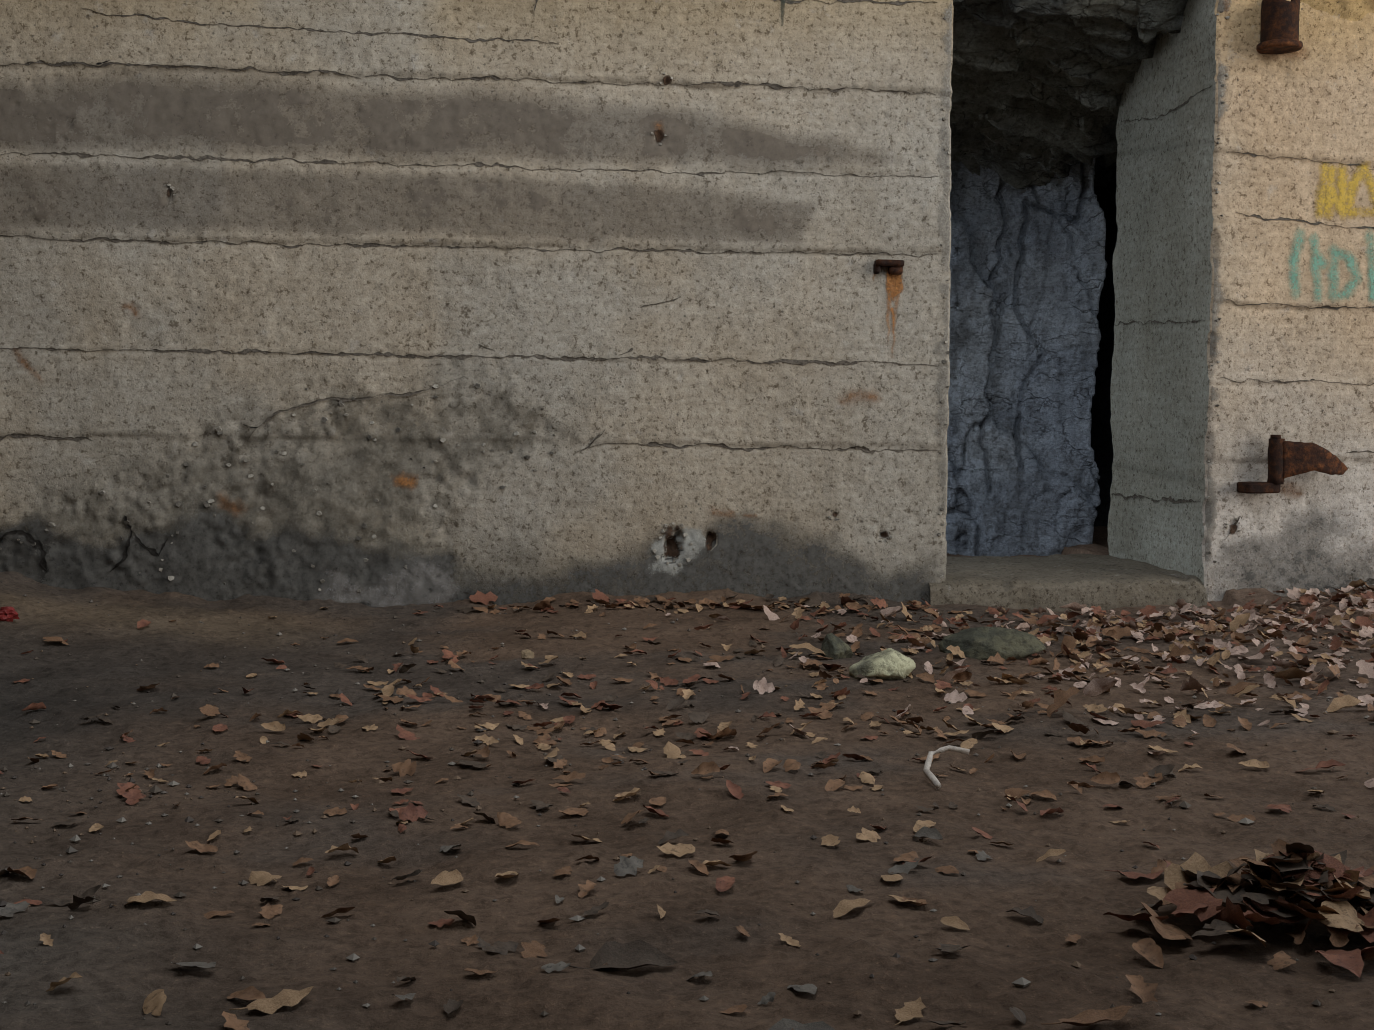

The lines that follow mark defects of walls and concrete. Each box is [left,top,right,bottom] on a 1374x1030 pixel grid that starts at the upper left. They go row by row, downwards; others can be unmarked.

rust [887,271,903,334]
water stain [0,511,929,608]
spalling [651,522,717,575]